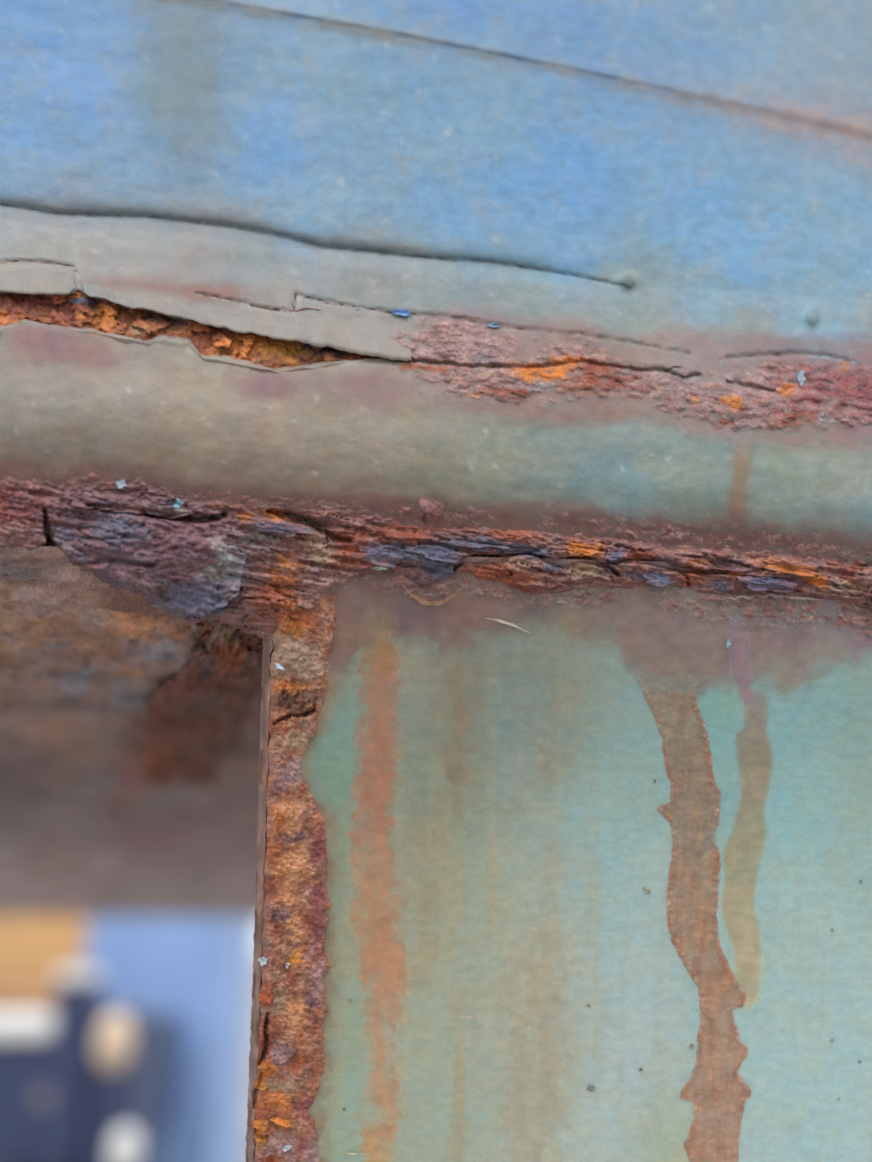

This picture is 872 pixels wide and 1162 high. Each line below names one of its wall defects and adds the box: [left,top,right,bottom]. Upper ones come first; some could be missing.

crack [0,204,612,284]
peeling [0,263,412,373]
peeling [76,479,184,513]
peeling [253,521,316,537]
peeling [350,529,630,570]
rust [140,565,872,1162]